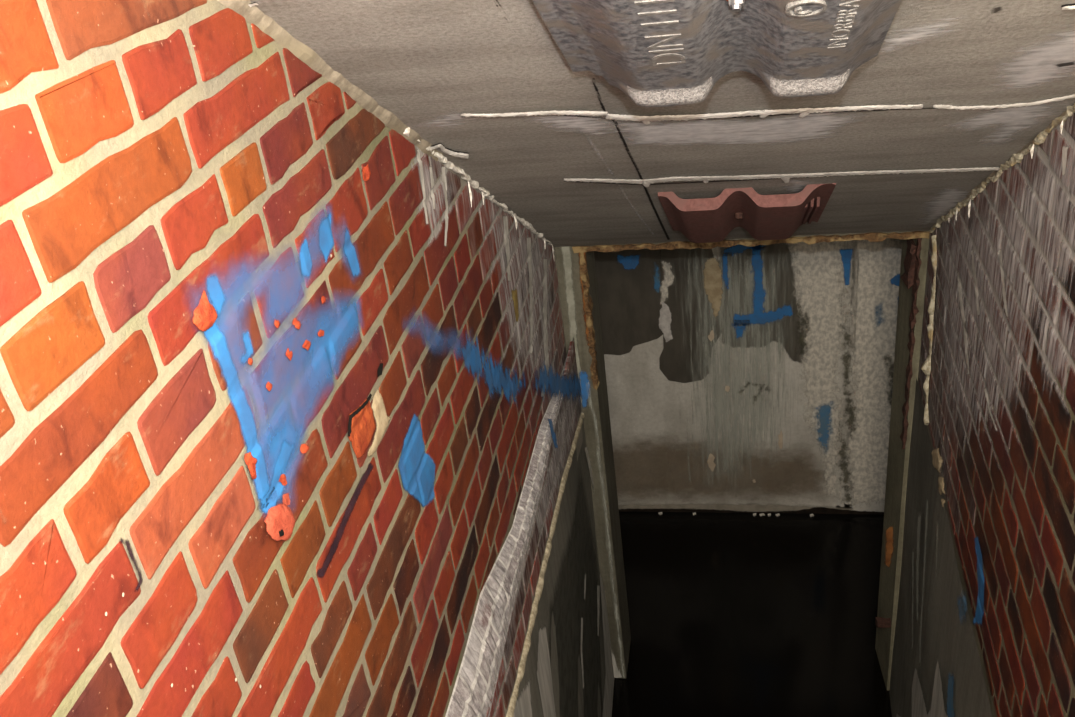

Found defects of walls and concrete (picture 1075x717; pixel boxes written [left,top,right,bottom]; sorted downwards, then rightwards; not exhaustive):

leakage [403,127,597,635]
peeling [660,261,674,304]
leakage [513,238,902,717]
leakage [932,448,945,508]
leakage [920,103,1075,449]